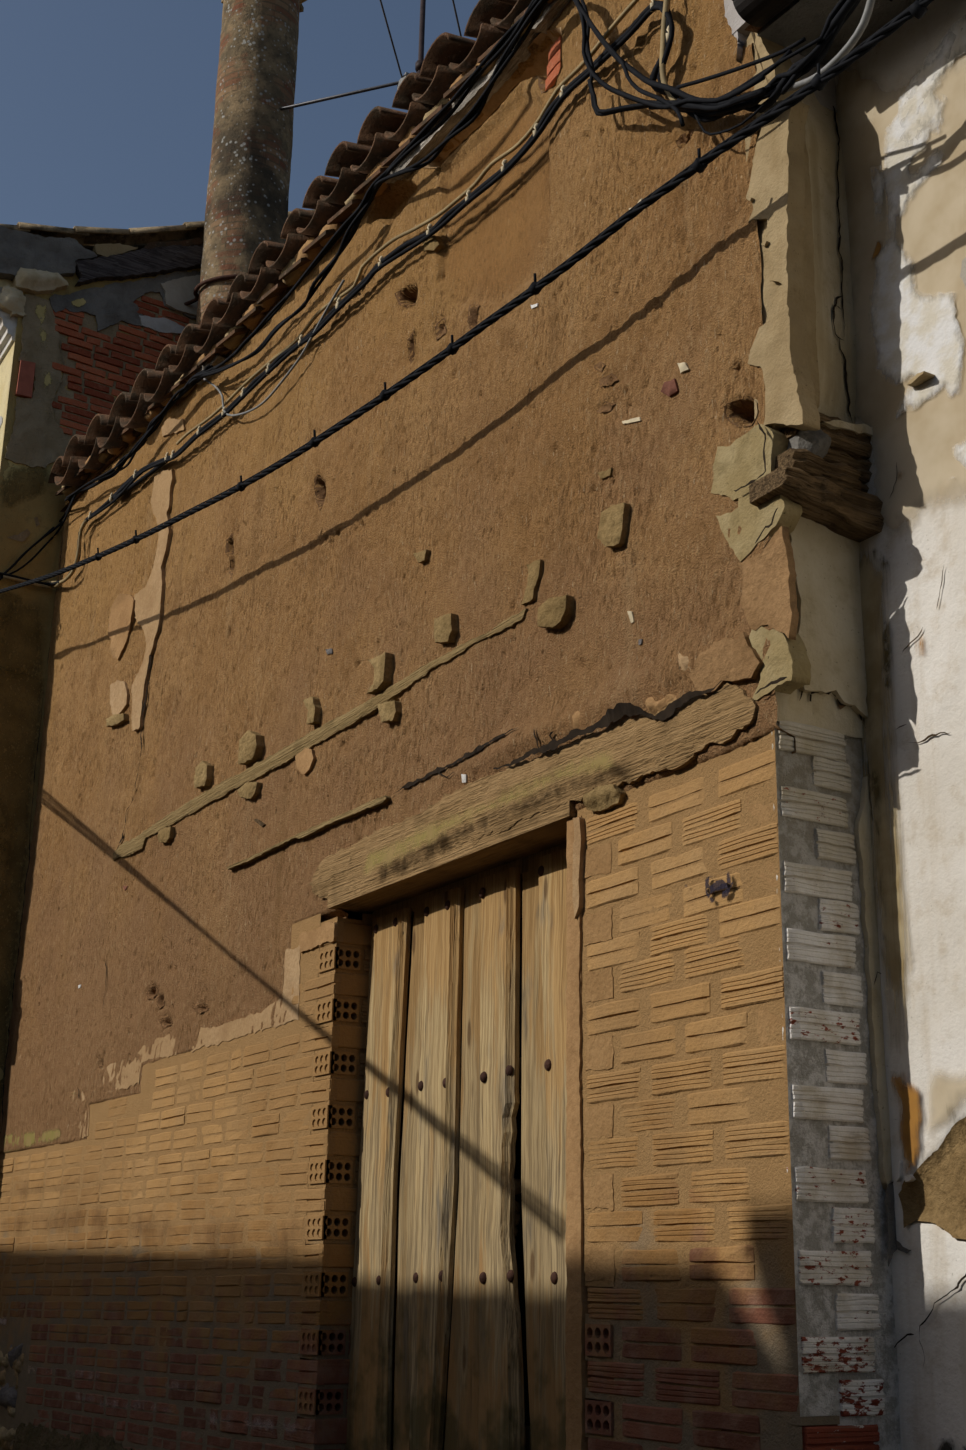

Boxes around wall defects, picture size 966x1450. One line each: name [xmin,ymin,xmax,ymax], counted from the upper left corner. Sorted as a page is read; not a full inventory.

crack [832,105,853,423]
peeling [871,18,966,418]
flaking render [711,100,868,720]
peeling [954,442,966,465]
flaking render [108,469,176,732]
crack [393,680,722,794]
crack [756,677,862,721]
crack [897,724,949,743]
water stain [3,1129,60,1148]
spalling [884,1117,966,1267]